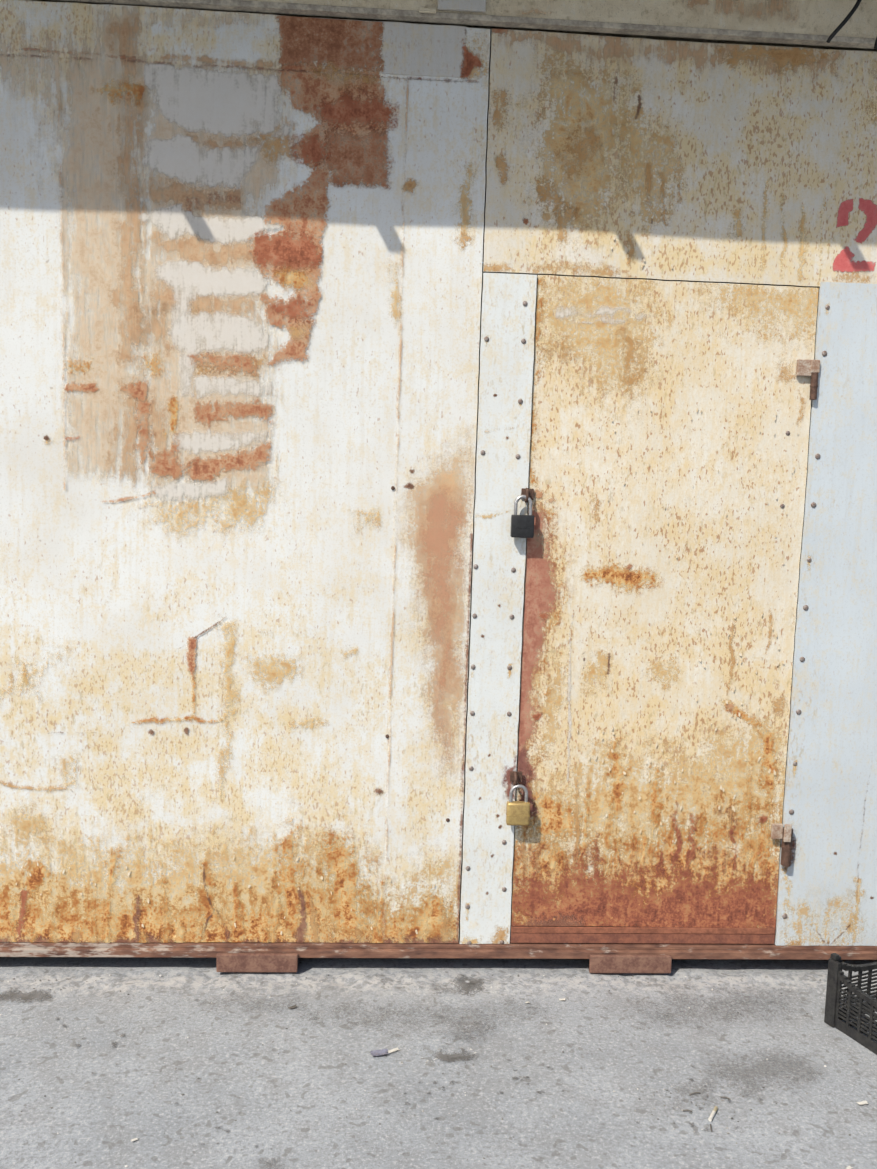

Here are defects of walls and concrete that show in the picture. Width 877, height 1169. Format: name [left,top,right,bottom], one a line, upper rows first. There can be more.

corrosion [460,39,488,79]
corrosion [161,15,398,375]
corrosion [458,164,473,248]
corrosion [484,264,513,272]
corrosion [496,155,508,184]
corrosion [536,52,628,241]
corrosion [64,361,99,393]
corrosion [120,354,273,482]
corrosion [405,451,473,764]
corrosion [492,264,864,946]
corrosion [132,622,301,789]
corrosion [0,809,478,944]